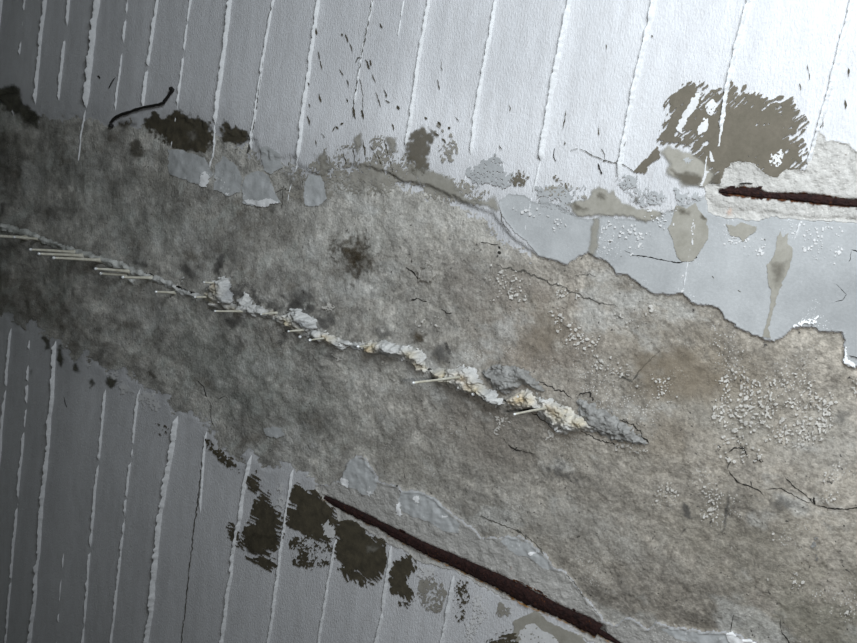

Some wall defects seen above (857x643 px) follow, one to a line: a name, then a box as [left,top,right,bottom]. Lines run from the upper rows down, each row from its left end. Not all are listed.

water stain [0,86,39,126]
water stain [661,146,719,187]
peeling [657,80,857,223]
rust [719,186,857,207]
crack [481,212,618,307]
crack [539,381,594,401]
crack [621,419,649,445]
crack [726,446,857,510]
peeling [226,474,339,572]
peeling [334,519,387,588]
peeling [388,554,417,602]
rust [324,496,620,643]